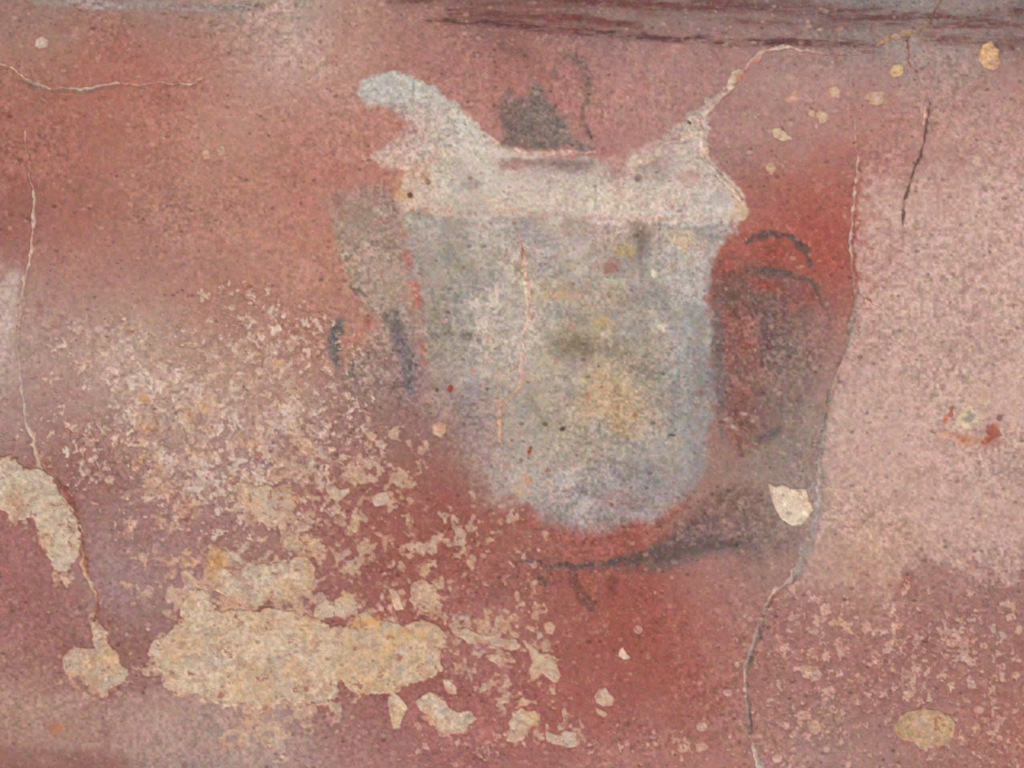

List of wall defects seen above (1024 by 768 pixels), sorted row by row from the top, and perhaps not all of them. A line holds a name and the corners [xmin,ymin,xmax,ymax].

crack [0,63,206,94]
crack [625,0,944,232]
crack [16,130,101,623]
leakage [46,304,334,464]
peeling [0,272,1024,768]
crack [742,115,880,768]